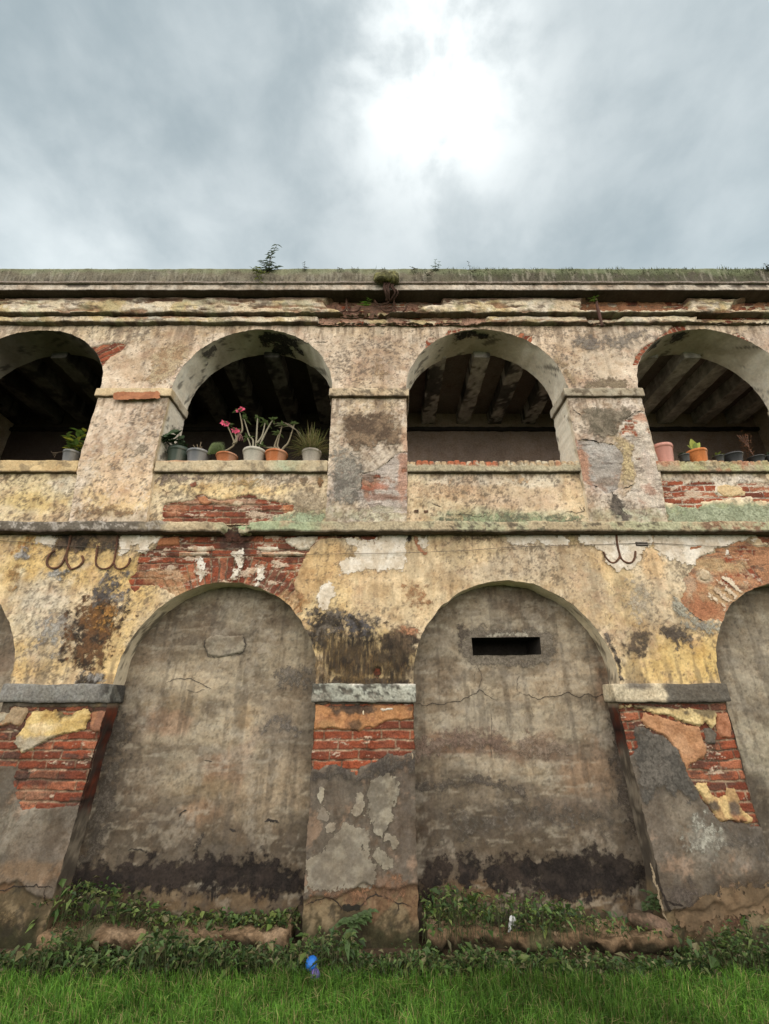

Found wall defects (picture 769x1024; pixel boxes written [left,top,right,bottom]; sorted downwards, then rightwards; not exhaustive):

flaking render [361,452,408,514]
flaking render [575,412,769,509]
damp [92,570,130,614]
flaking render [118,482,429,614]
flaking render [504,535,769,622]
damp [274,605,420,690]
crack [517,675,603,714]
flaking render [0,706,106,810]
flaking render [311,703,415,775]
flaking render [618,703,759,865]
flaking render [304,773,401,893]
crack [305,892,409,912]